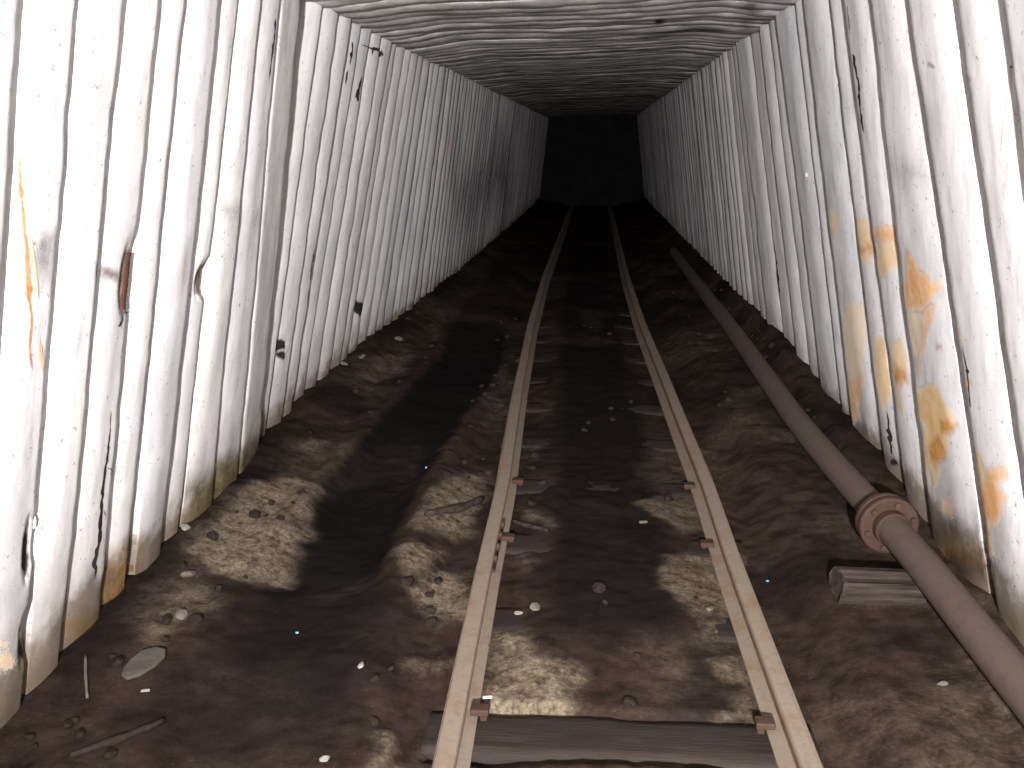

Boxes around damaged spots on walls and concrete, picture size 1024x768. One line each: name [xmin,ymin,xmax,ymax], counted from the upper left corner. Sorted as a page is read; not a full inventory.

crack [847,5,864,132]
rust [18,154,44,371]
crack [92,415,113,576]
crack [886,414,898,465]
rust [842,212,958,524]
rust [974,447,1013,588]